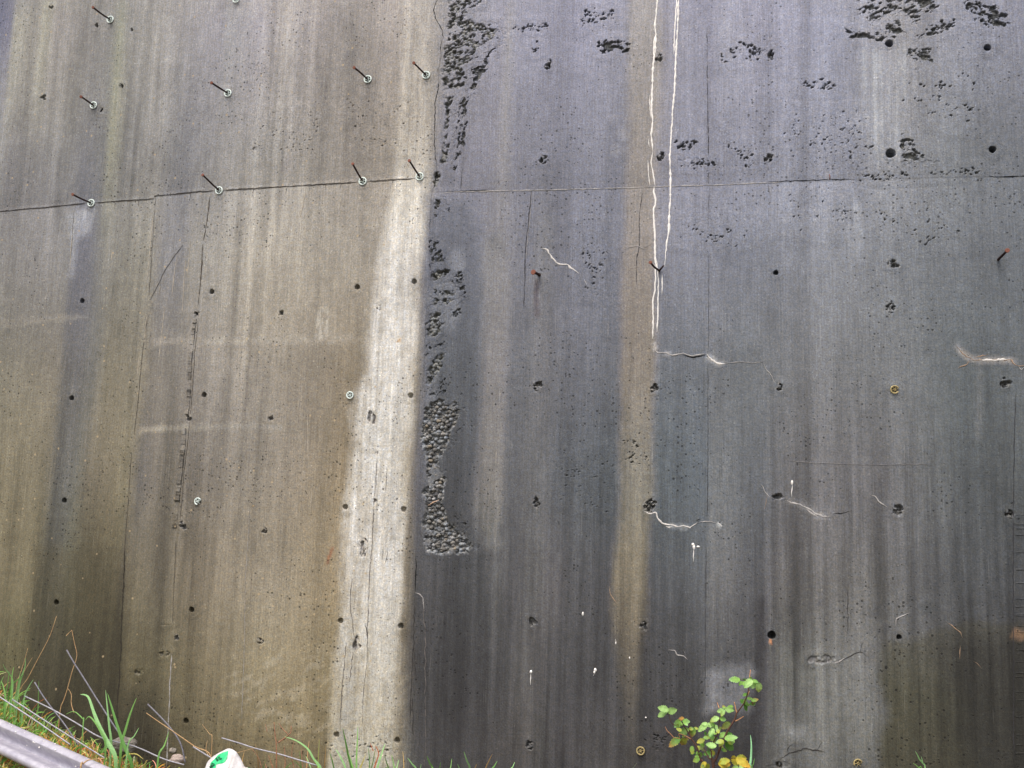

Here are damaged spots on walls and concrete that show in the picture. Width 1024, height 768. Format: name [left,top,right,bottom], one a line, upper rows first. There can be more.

spalling [417,0,641,407]
crack [541,235,585,280]
damp [609,0,677,425]
spalling [663,0,1024,264]
damp [450,213,559,619]
crack [645,511,722,528]
crack [653,342,774,381]
crack [762,486,848,518]
crack [957,347,1024,370]
damp [604,478,691,768]
damp [698,594,811,767]
damp [859,601,1024,768]